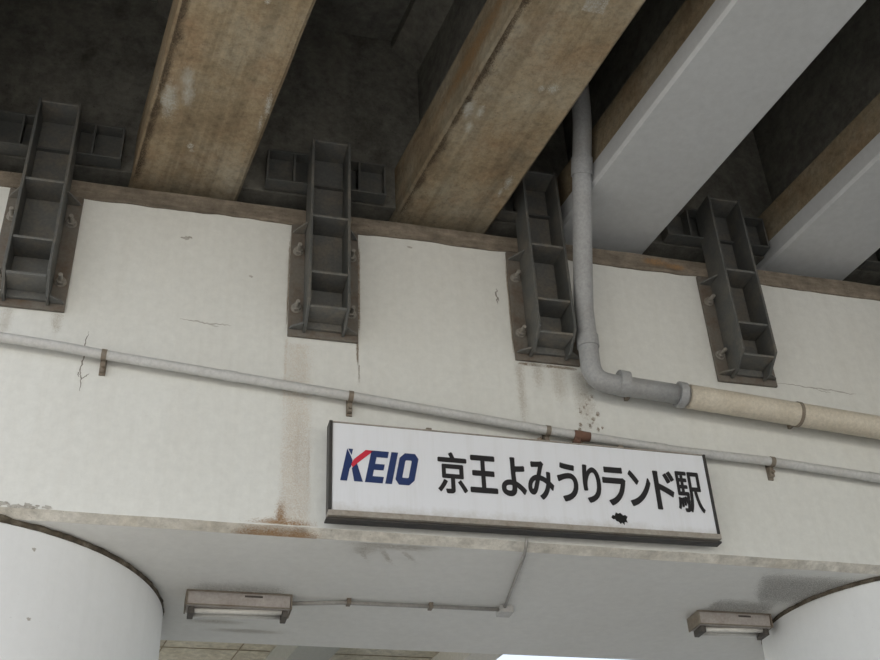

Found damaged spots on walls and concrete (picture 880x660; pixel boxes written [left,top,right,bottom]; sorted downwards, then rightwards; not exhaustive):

crack [77,334,89,391]
corrosion [232,501,325,539]